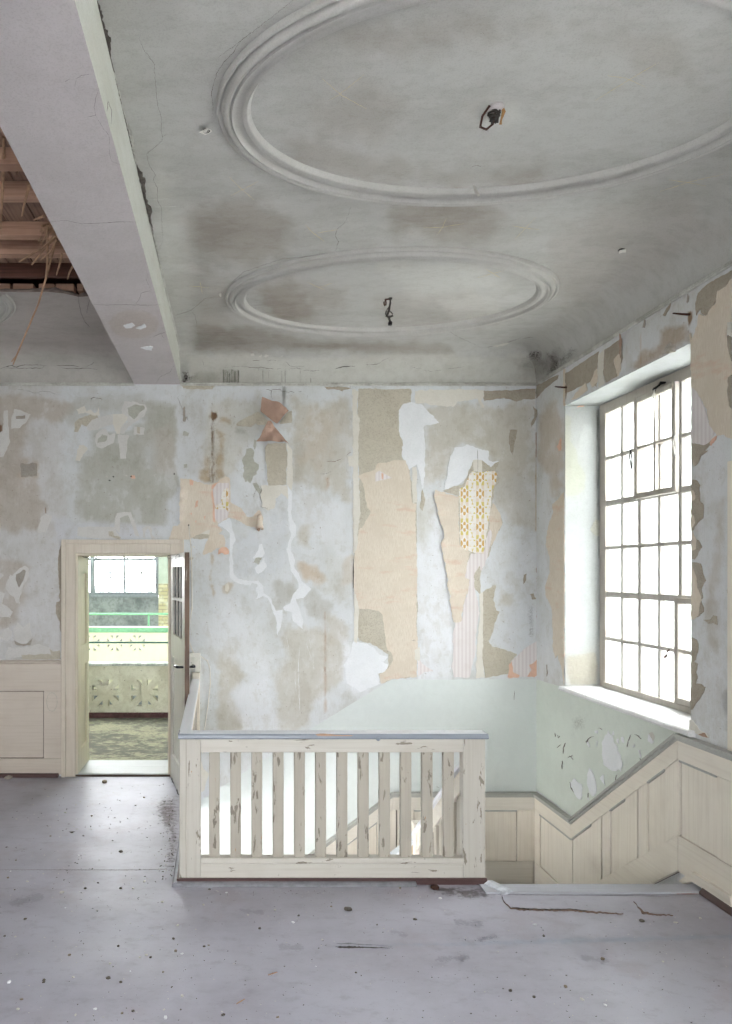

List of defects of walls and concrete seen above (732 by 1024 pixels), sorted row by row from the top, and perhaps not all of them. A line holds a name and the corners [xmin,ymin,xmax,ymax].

crack [68,44,163,249]
flaking render [686,270,732,316]
flaking render [483,340,623,402]
flaking render [0,409,31,457]
flaking render [325,386,439,552]
flaking render [691,442,710,467]
flaking render [218,485,311,635]
flaking render [444,444,517,678]
flaking render [691,480,718,625]
flaking render [344,609,393,692]
flaking render [690,637,706,710]
crack [502,897,673,916]